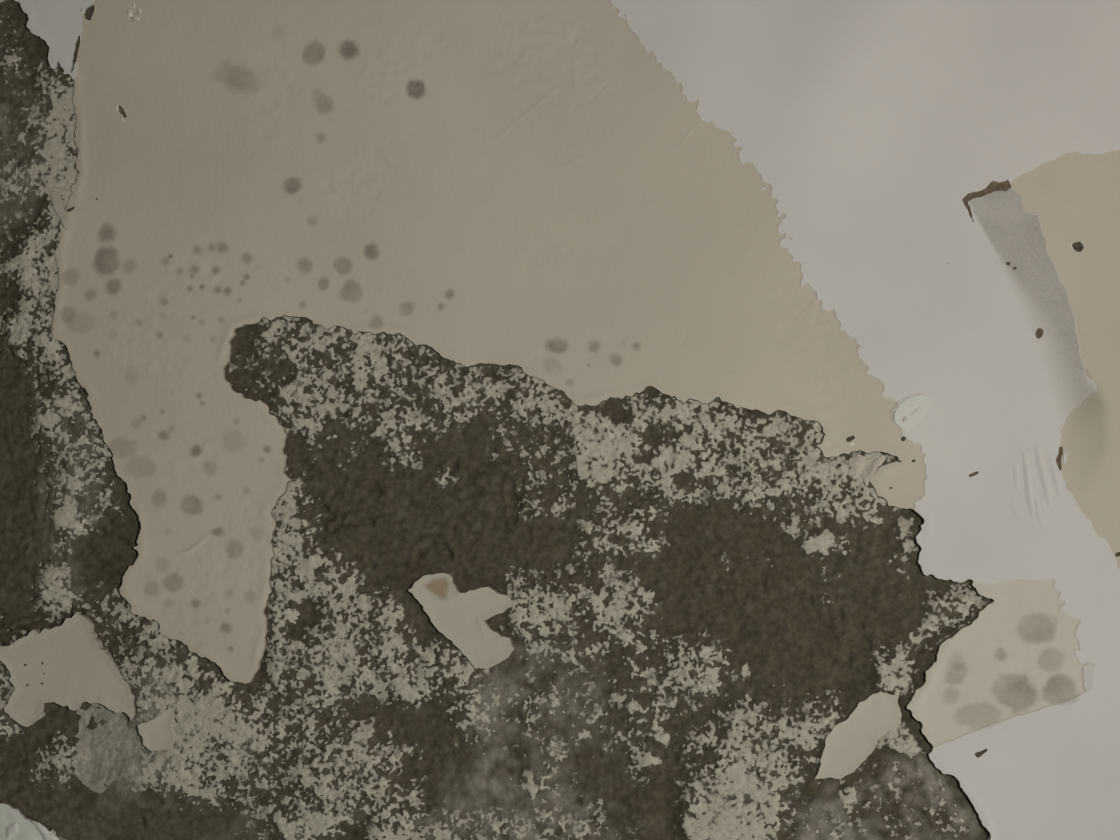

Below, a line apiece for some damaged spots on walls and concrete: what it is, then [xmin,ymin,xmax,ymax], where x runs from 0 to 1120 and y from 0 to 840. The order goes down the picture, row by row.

flaking render [0,0,187,840]
peeling [51,0,930,684]
flaking render [133,315,1094,840]
peeling [1006,149,1120,569]